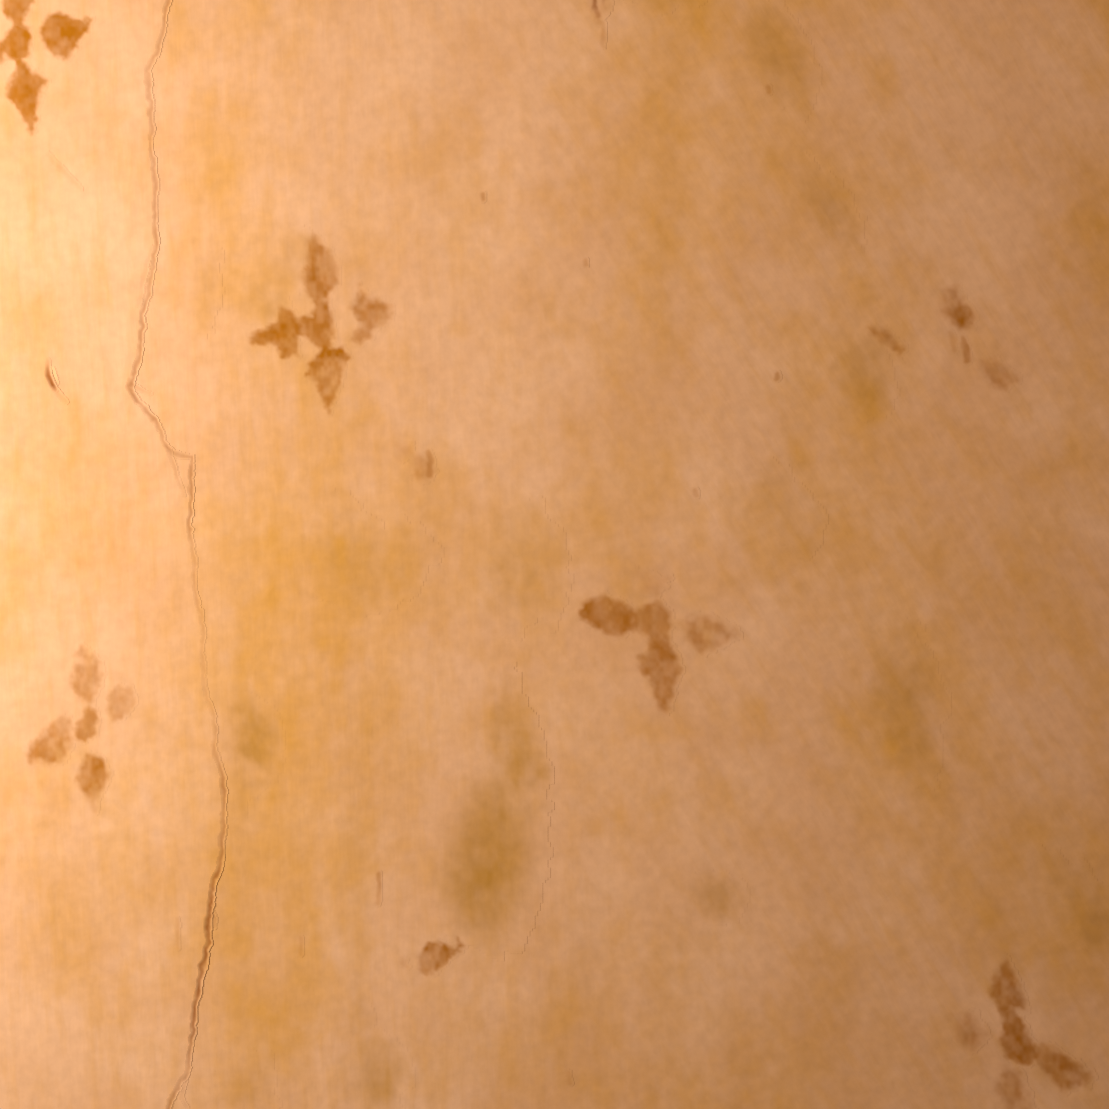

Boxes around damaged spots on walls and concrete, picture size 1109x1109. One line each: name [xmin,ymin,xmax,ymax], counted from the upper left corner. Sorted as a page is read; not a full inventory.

crack [125,0,228,1109]